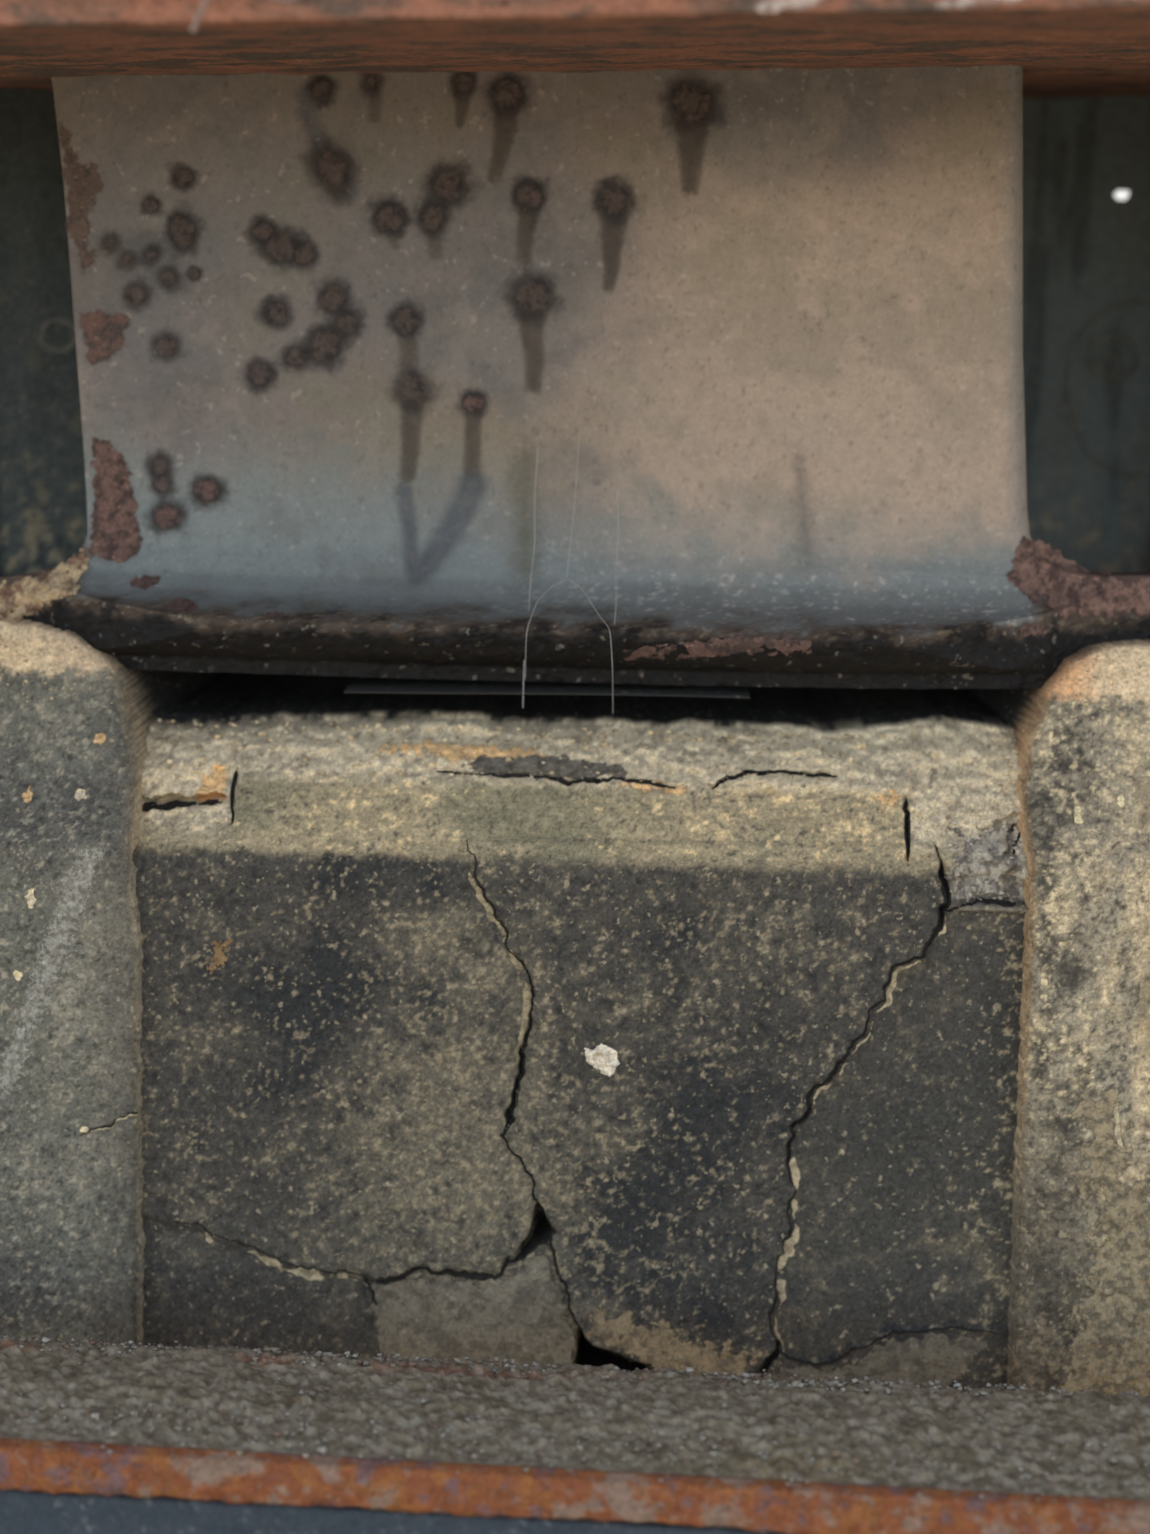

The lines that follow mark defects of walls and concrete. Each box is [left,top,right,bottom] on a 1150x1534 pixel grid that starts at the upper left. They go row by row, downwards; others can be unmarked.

corrosion [59,127,202,365]
corrosion [246,282,363,393]
corrosion [510,177,554,390]
corrosion [87,437,226,590]
corrosion [1006,536,1150,638]
corrosion [623,635,812,661]
crack [142,770,238,824]
crack [436,769,838,789]
spalling [953,818,1022,903]
crack [174,840,591,1346]
crack [757,799,1016,1375]
corrosion [0,1438,1150,1534]